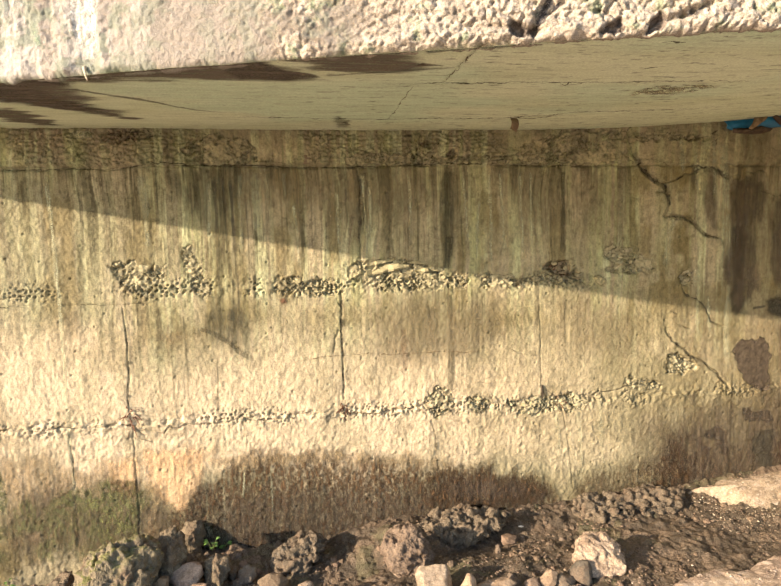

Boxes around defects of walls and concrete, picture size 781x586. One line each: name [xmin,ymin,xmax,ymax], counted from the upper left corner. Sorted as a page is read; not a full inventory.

leakage [427,44,520,53]
leakage [0,52,430,125]
leakage [175,169,241,320]
spalling [348,256,455,289]
leakage [444,233,453,267]
leakage [725,178,781,317]
crack [668,312,728,388]
peeling [732,337,772,391]
spalling [507,392,588,418]
peeling [742,408,773,422]
leakage [171,449,557,550]